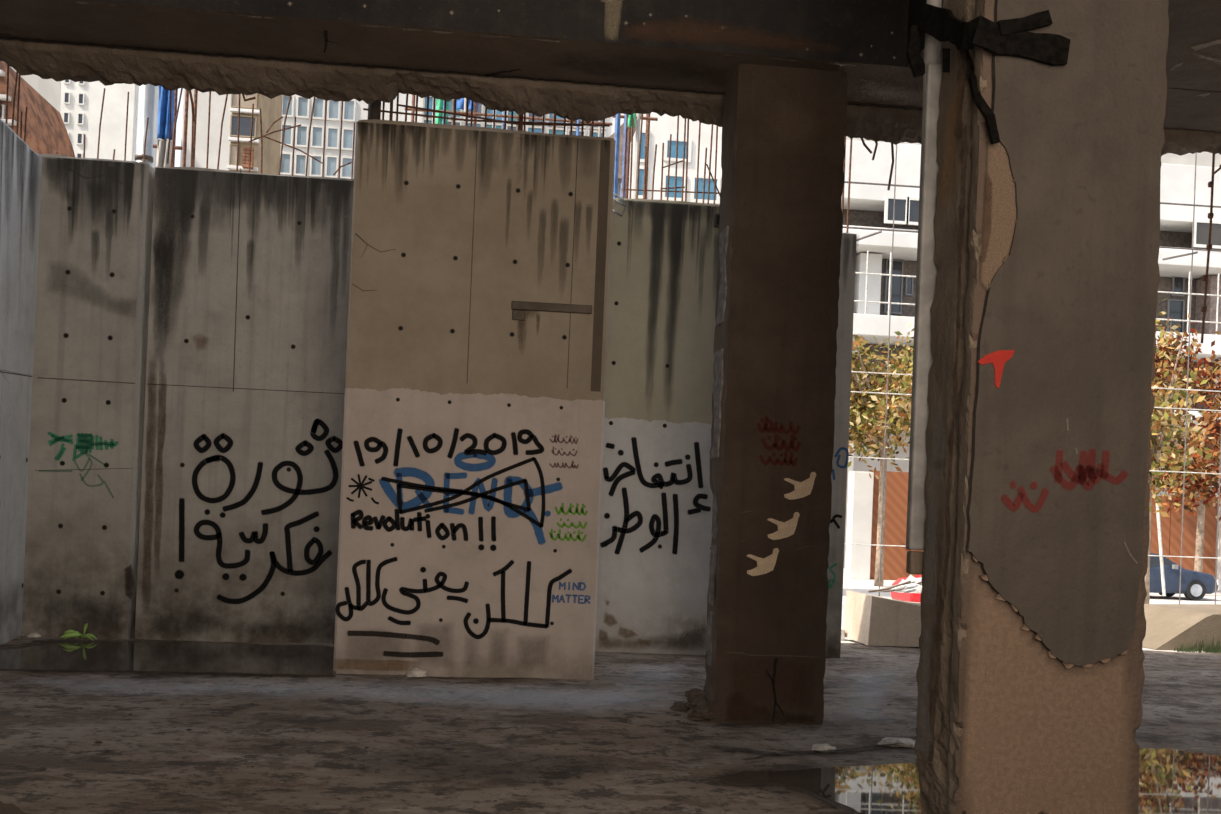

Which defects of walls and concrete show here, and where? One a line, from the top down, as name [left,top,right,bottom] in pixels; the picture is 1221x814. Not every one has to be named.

spalling [382,93,513,130]
spalling [532,113,605,137]
water stain [629,201,713,321]
water stain [1,122,350,569]